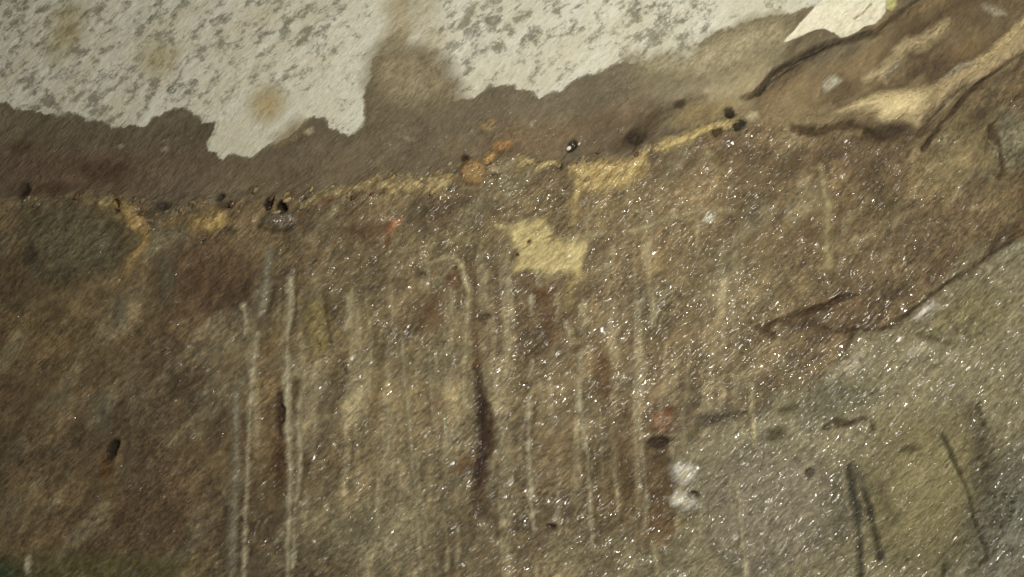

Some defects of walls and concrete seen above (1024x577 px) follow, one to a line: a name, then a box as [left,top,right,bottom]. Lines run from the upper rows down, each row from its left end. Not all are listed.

water stain [371,22,459,111]
peeling [0,0,897,159]
water stain [97,196,150,276]
water stain [168,206,228,233]
spalling [252,119,562,214]
water stain [419,255,471,417]
water stain [495,219,589,340]
water stain [913,302,941,324]
water stain [227,247,272,577]
water stain [282,276,305,577]
water stain [526,395,535,530]
water stain [670,462,697,509]